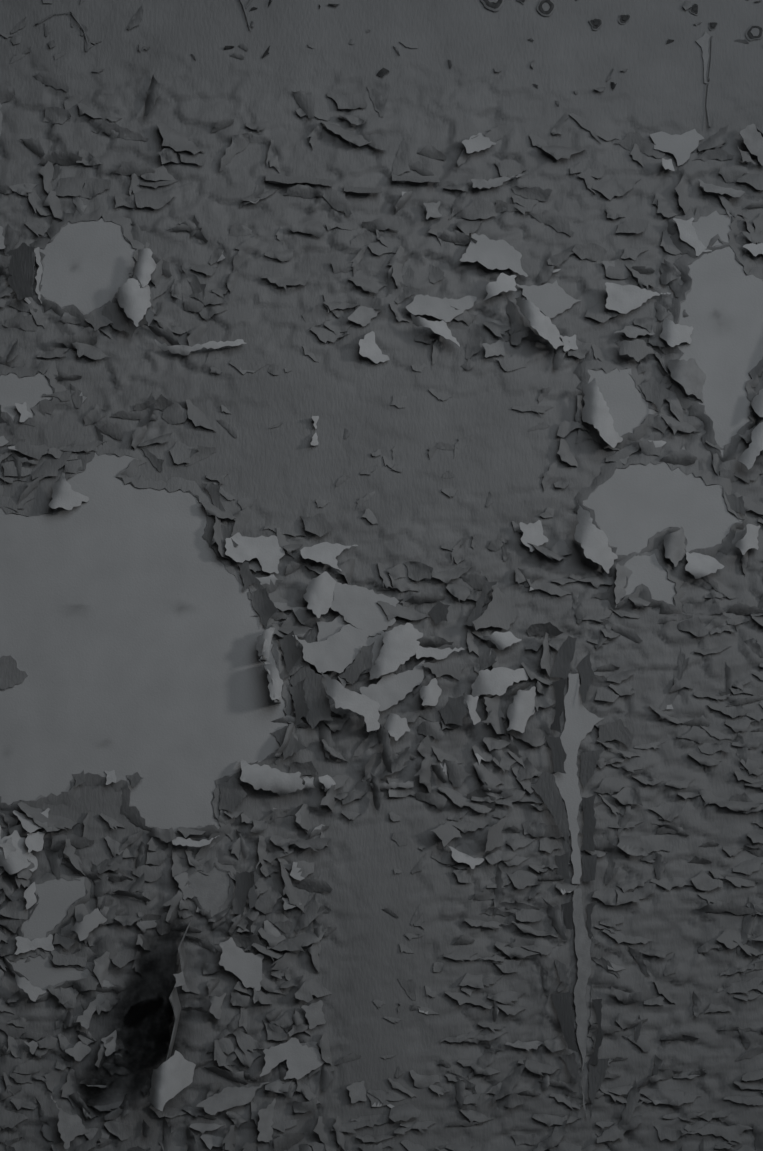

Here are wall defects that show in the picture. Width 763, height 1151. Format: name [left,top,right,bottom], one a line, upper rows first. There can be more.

peeling [33,71,149,141]
peeling [292,87,516,177]
peeling [240,101,763,614]
water stain [84,951,181,1104]
peeling [0,119,571,1151]
crack [331,573,763,1151]